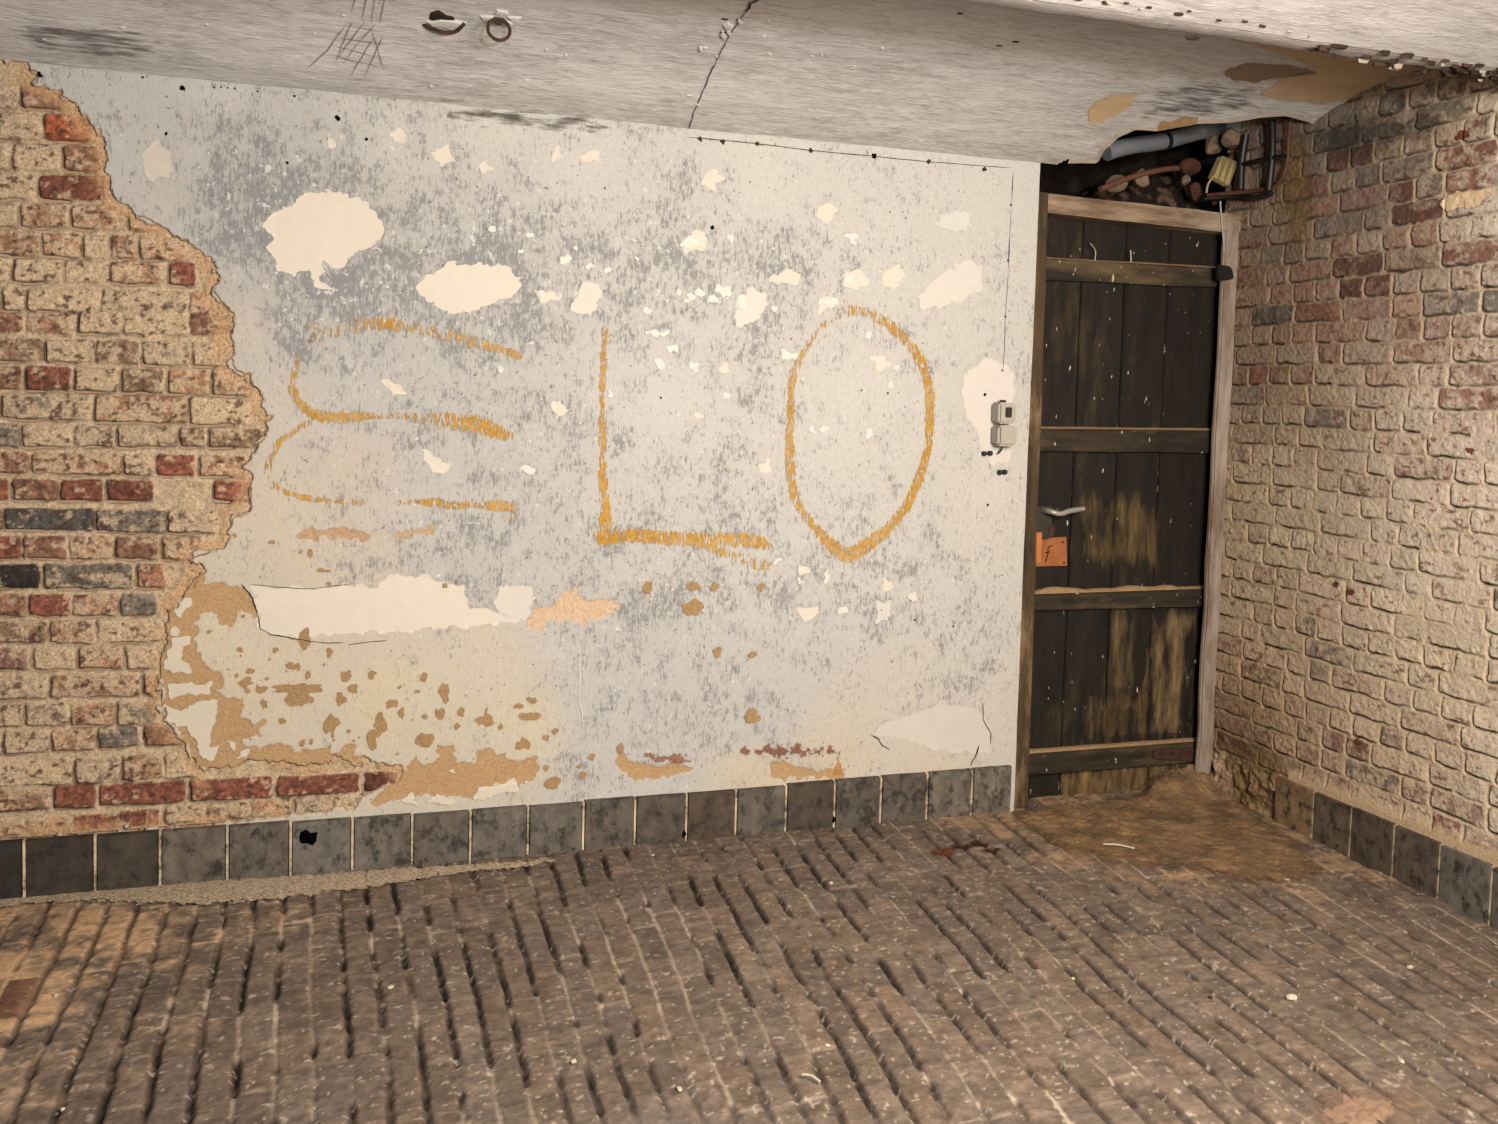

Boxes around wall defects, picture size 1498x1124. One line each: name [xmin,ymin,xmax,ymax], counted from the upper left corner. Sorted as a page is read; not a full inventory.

spalling [422,9,522,35]
crack [689,0,759,128]
peeling [1068,20,1498,163]
peeling [643,307,700,374]
peeling [961,357,1015,466]
flaking render [0,61,620,839]
peeling [683,581,720,616]
peeling [773,558,830,584]
peeling [744,708,761,723]
peeling [874,700,991,756]
peeling [615,743,693,780]
corrosion [740,743,843,775]